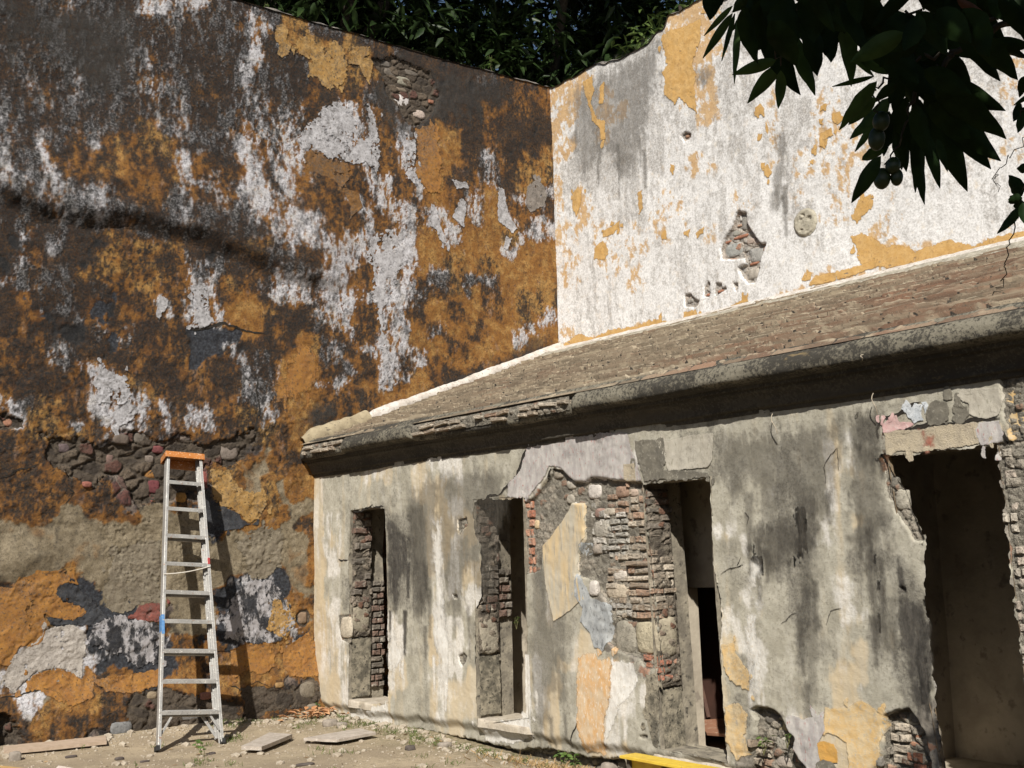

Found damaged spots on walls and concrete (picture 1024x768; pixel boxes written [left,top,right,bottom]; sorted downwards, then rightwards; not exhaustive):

peeling [275,23,469,251]
crack [190,322,265,334]
flaking render [683,212,766,318]
peeling [802,193,1024,286]
flaking render [0,357,321,734]
crack [486,449,526,499]
flaking render [472,432,715,768]
damp [745,603,762,710]
damp [749,563,760,590]
peeling [721,635,932,768]
damp [897,558,932,719]
flaking render [876,377,1024,664]